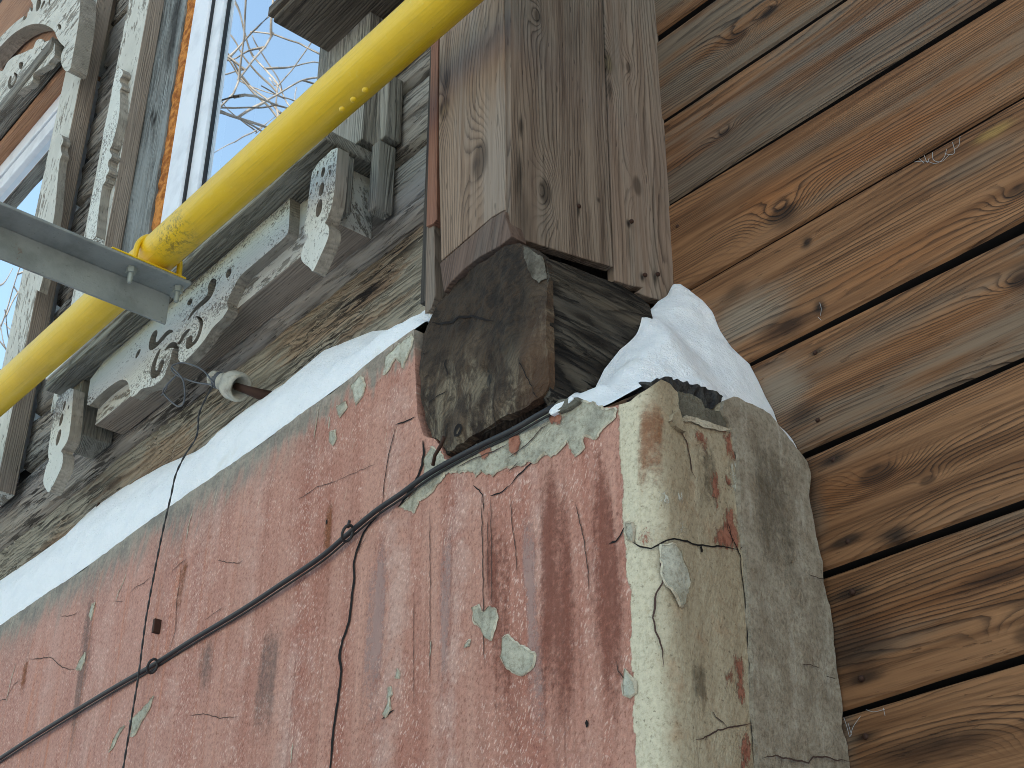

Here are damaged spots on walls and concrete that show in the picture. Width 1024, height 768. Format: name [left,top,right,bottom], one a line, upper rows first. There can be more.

peeling [399,400,617,513]
crack [297,350,448,768]
peeling [464,604,537,676]
crack [458,383,547,654]
peeling [624,521,691,608]
crack [572,501,750,685]
peeling [108,696,154,752]
crack [696,712,850,764]